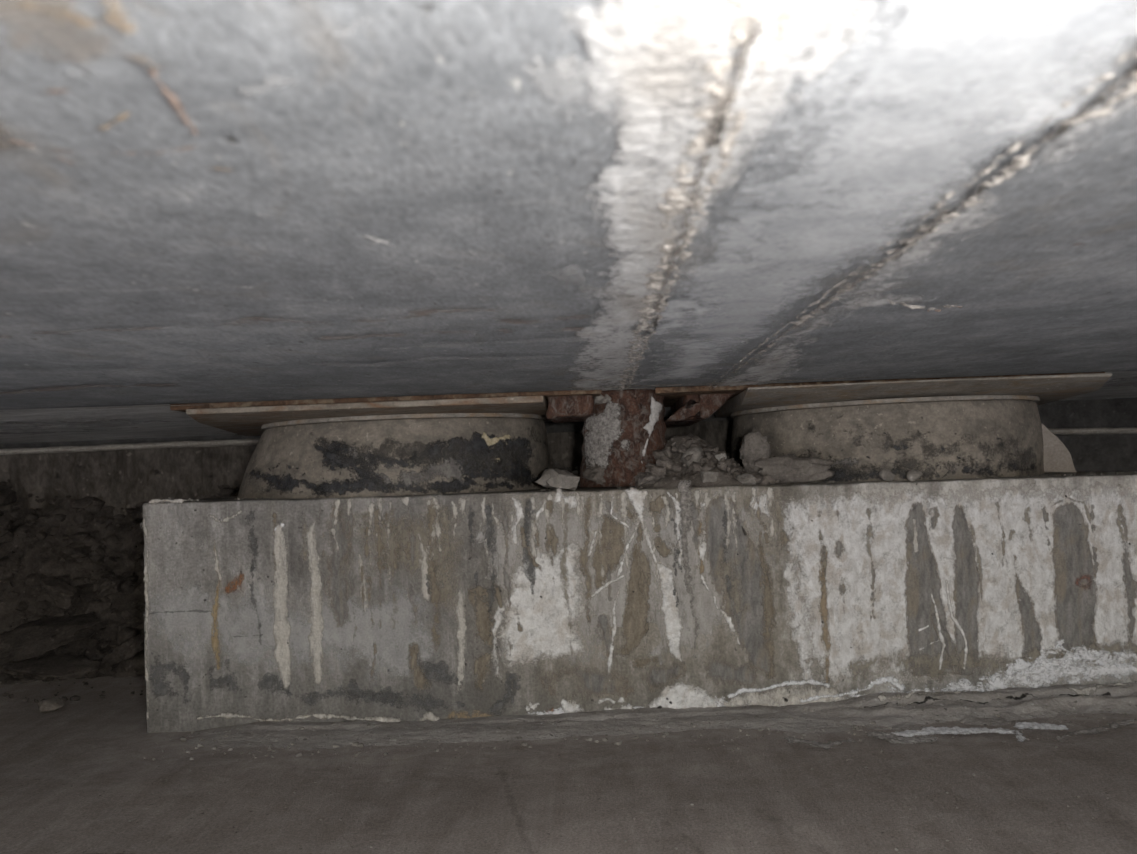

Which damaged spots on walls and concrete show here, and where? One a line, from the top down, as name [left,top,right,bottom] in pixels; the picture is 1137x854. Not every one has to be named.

crack [619,0,798,391]
water stain [547,0,1137,390]
crack [705,53,1137,389]
rust [211,540,245,670]
water stain [149,481,1137,722]